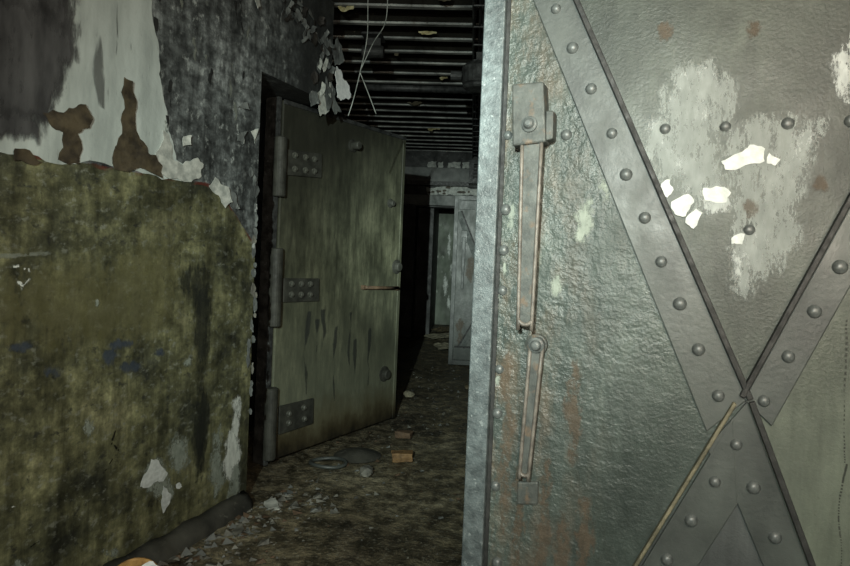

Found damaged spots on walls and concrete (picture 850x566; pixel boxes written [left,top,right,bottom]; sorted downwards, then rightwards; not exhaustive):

damp [0,108,46,143]
peeling [0,0,204,182]
flaking render [209,177,240,209]
flaking render [237,129,259,144]
peeling [281,0,351,116]
peeling [642,59,826,298]
peeling [831,35,850,104]
damp [0,252,48,290]
damp [181,265,211,366]
flaking render [246,167,259,396]
flaking render [140,437,191,513]
damp [192,387,242,499]